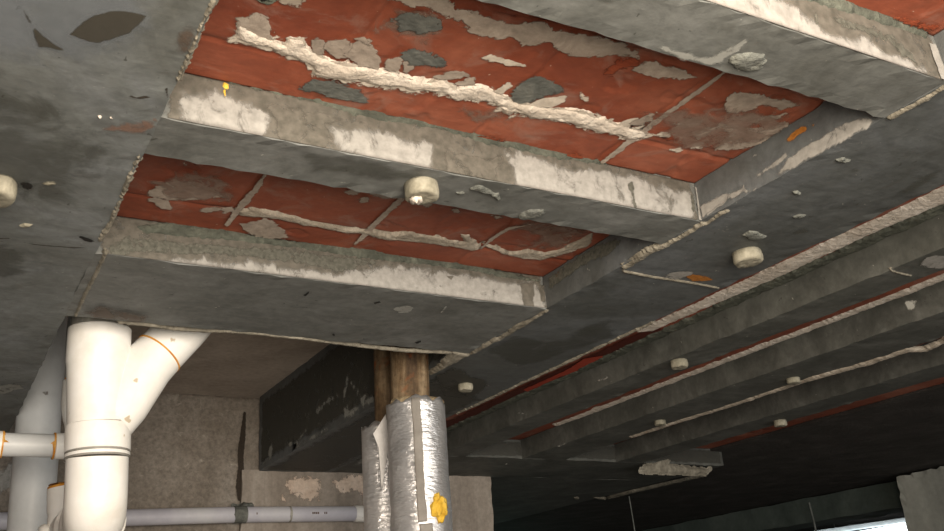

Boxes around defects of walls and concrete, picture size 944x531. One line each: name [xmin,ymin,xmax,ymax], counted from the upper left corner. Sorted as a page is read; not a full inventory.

damp [70,11,146,43]
spalling [894,16,940,31]
peeling [200,206,234,214]
spalling [638,459,712,476]
peeling [280,474,363,502]